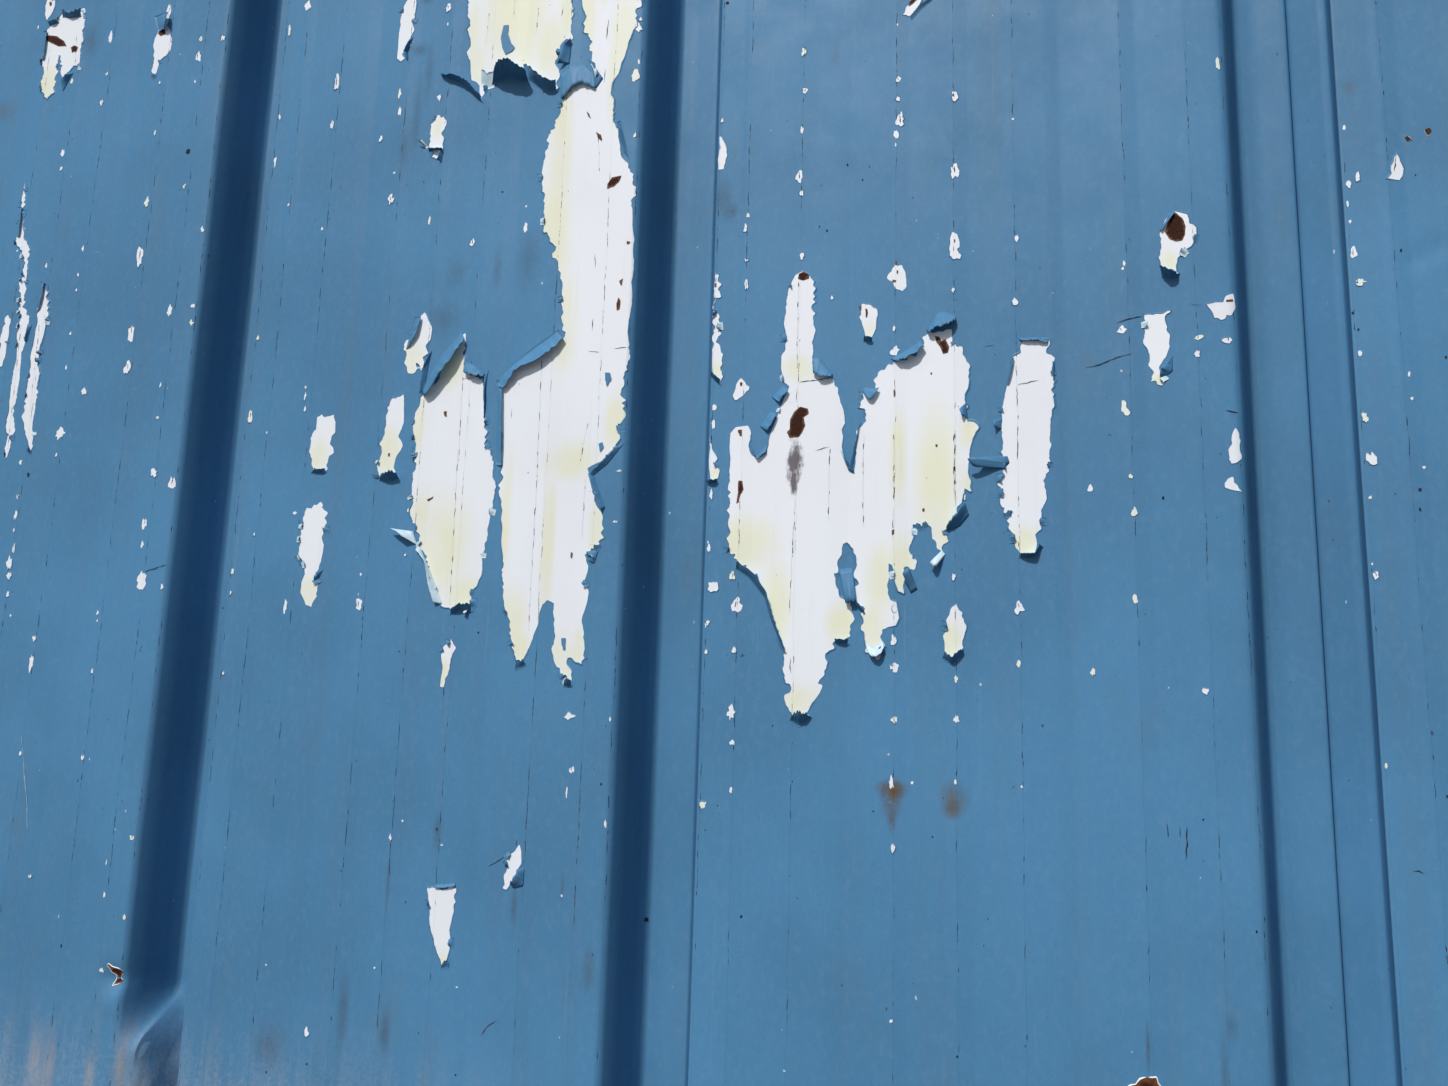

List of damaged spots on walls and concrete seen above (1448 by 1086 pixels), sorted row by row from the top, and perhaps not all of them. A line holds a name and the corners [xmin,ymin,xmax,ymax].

peeling [37,0,86,100]
peeling [1157,210,1199,280]
peeling [0,183,51,465]
peeling [371,0,644,687]
peeling [1117,309,1173,387]
peeling [1193,293,1236,358]
peeling [303,386,336,475]
peeling [706,251,1058,727]
peeling [283,501,330,615]
peeling [439,638,456,708]
peeling [425,883,457,969]
rust [1112,1076,1161,1086]